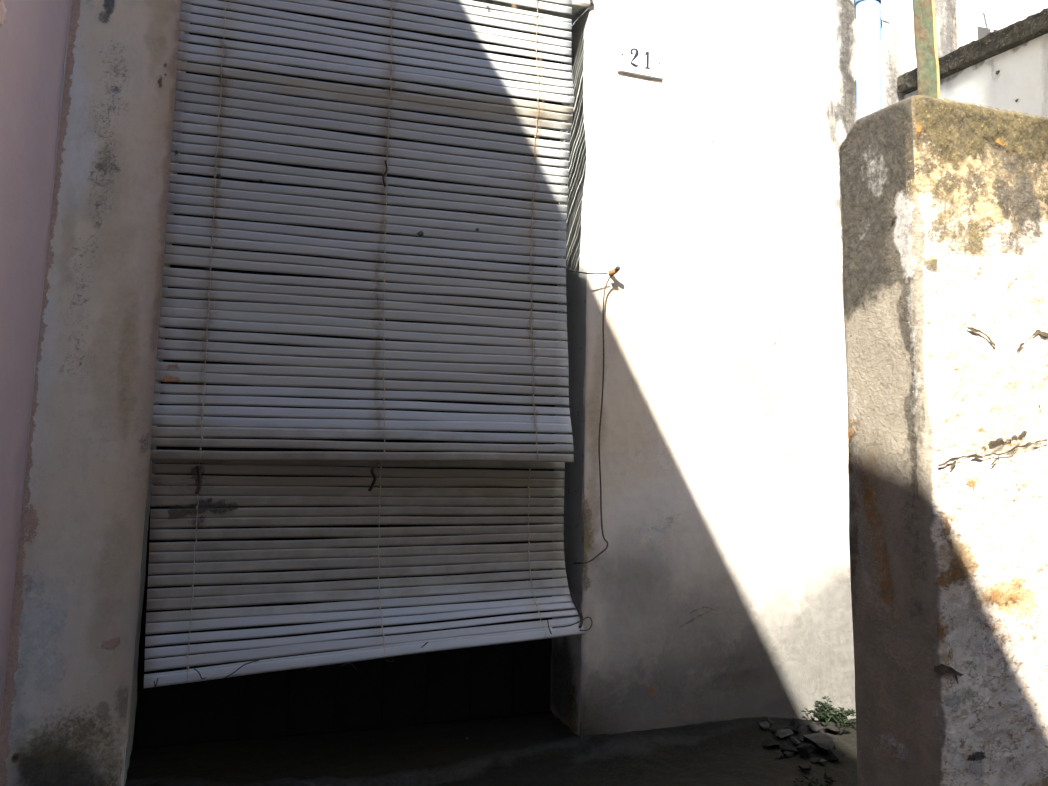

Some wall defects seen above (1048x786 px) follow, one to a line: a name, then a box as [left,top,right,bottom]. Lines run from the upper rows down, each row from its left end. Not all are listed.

water stain [99,0,114,22]
water stain [826,0,915,314]
water stain [928,213,950,239]
crack [967,327,1048,352]
crack [938,439,1047,470]
water stain [19,745,122,786]